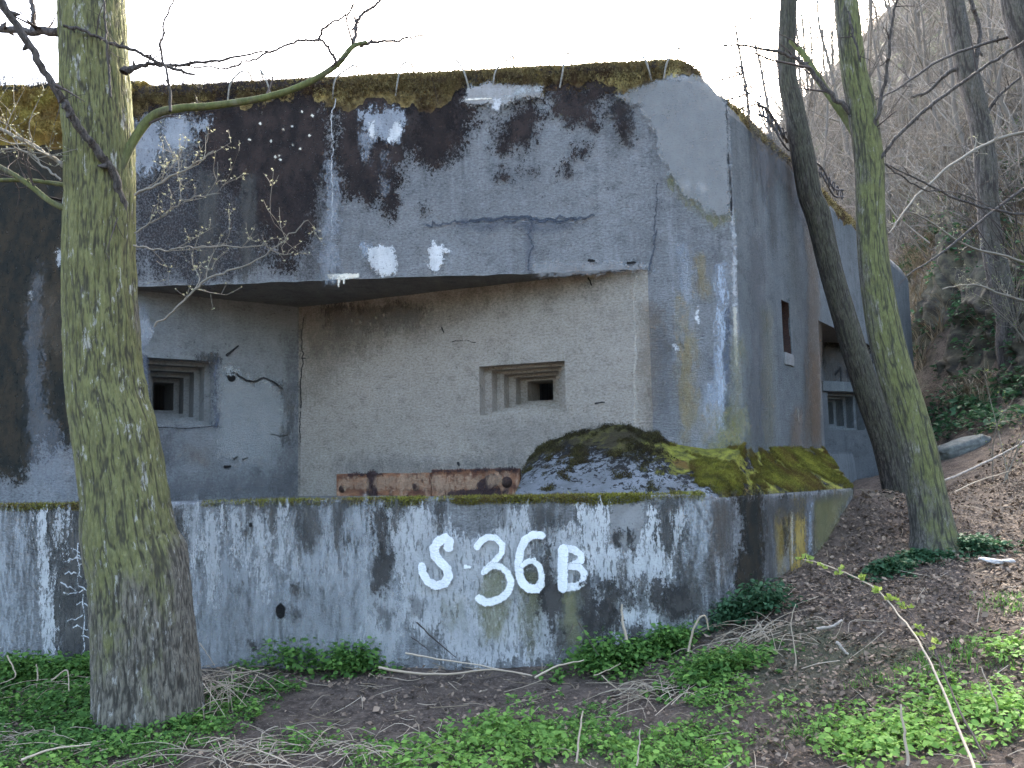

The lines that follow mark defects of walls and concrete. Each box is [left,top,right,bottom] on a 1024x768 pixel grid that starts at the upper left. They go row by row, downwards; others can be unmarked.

water stain [0,73,58,93]
water stain [131,59,662,287]
crack [426,214,595,270]
water stain [0,145,70,488]
efflorescence [713,264,733,446]
water stain [24,499,90,660]
water stain [216,498,405,561]
rust [348,469,383,496]
water stain [431,501,444,535]
rust [431,466,516,496]
water stain [534,495,713,653]
water stain [729,487,792,600]